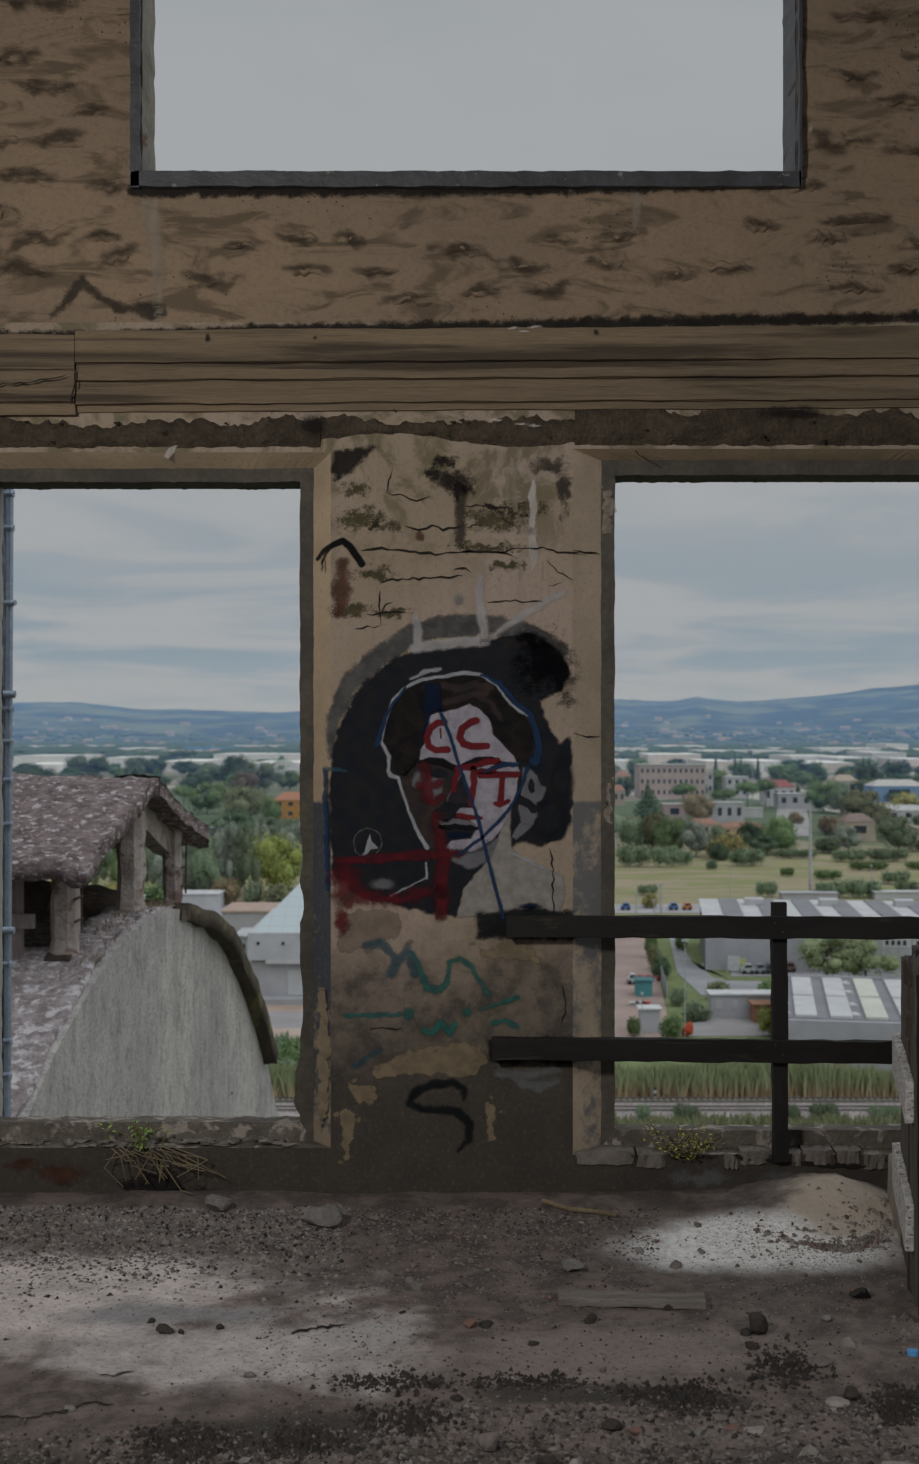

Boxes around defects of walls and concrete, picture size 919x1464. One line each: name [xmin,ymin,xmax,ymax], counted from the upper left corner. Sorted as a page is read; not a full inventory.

spalling [0,408,919,458]
crack [356,472,599,629]
peeling [315,987,488,1164]
peeling [485,1097,502,1142]